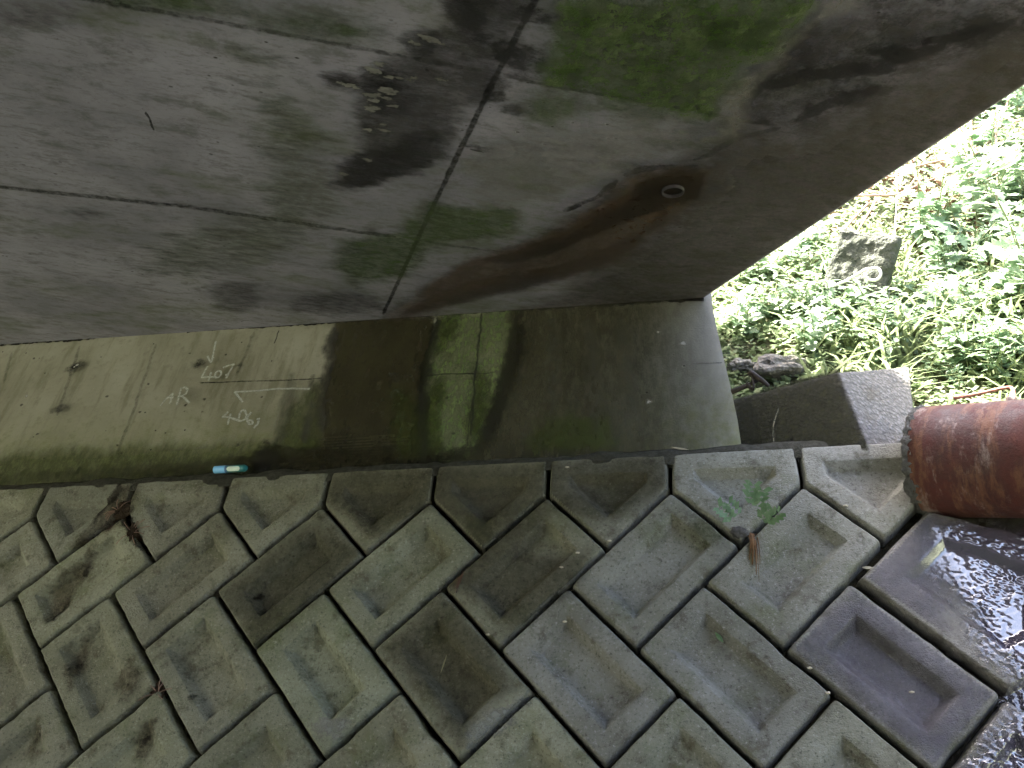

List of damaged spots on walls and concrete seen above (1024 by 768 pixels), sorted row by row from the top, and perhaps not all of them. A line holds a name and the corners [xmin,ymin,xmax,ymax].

corrosion [390,169,707,320]
leakage [165,0,1024,620]